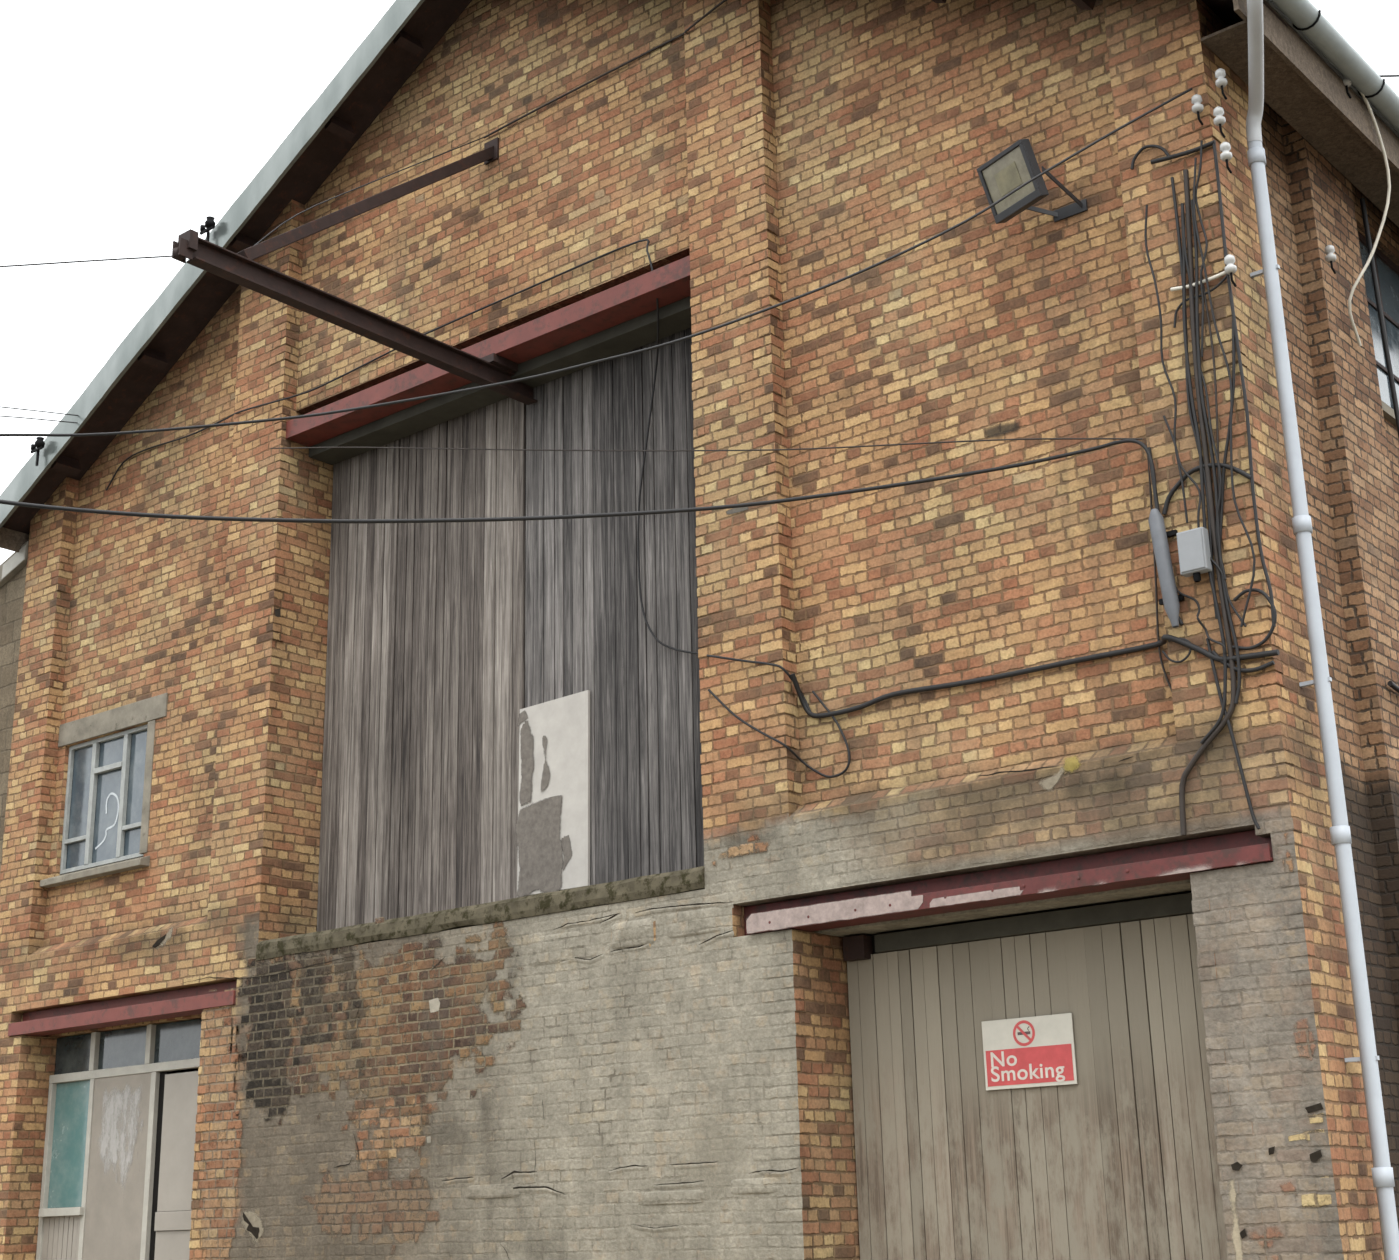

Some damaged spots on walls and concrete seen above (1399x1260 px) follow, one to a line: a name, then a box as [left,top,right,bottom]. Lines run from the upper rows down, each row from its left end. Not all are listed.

peeling [196,922,526,1260]